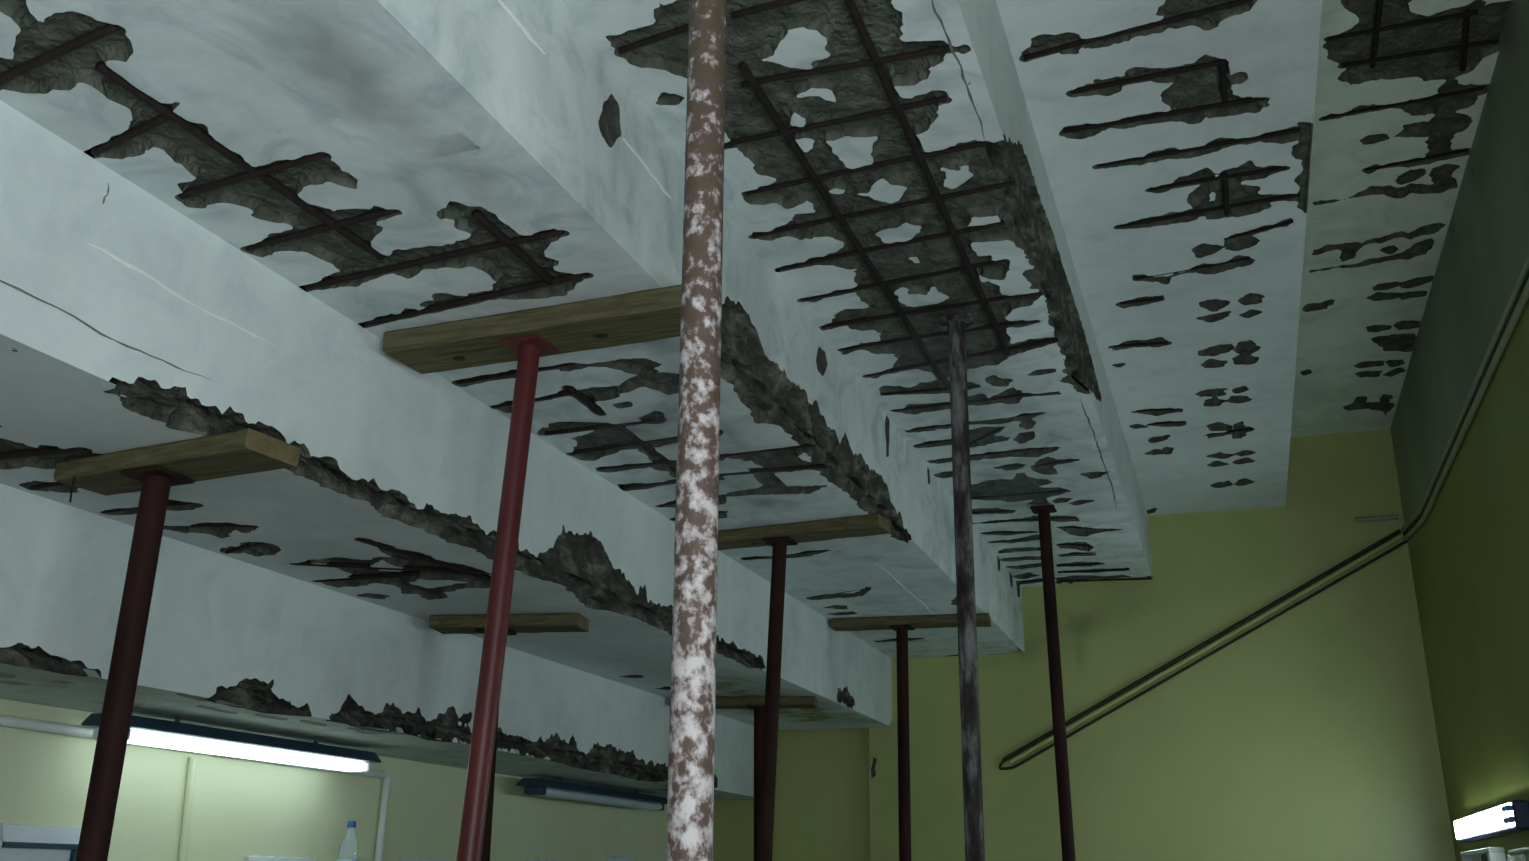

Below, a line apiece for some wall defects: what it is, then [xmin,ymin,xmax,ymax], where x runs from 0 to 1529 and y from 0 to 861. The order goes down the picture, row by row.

spalling [606,0,689,78]
spalling [1019,0,1257,62]
spalling [1059,54,1270,139]
spalling [0,0,594,328]
spalling [1092,0,1510,308]
crack [0,280,213,381]
spalling [718,0,1153,598]
spalling [100,377,497,600]
spalling [535,358,679,521]
spalling [515,525,673,635]
spalling [176,678,472,745]
spalling [497,727,668,782]